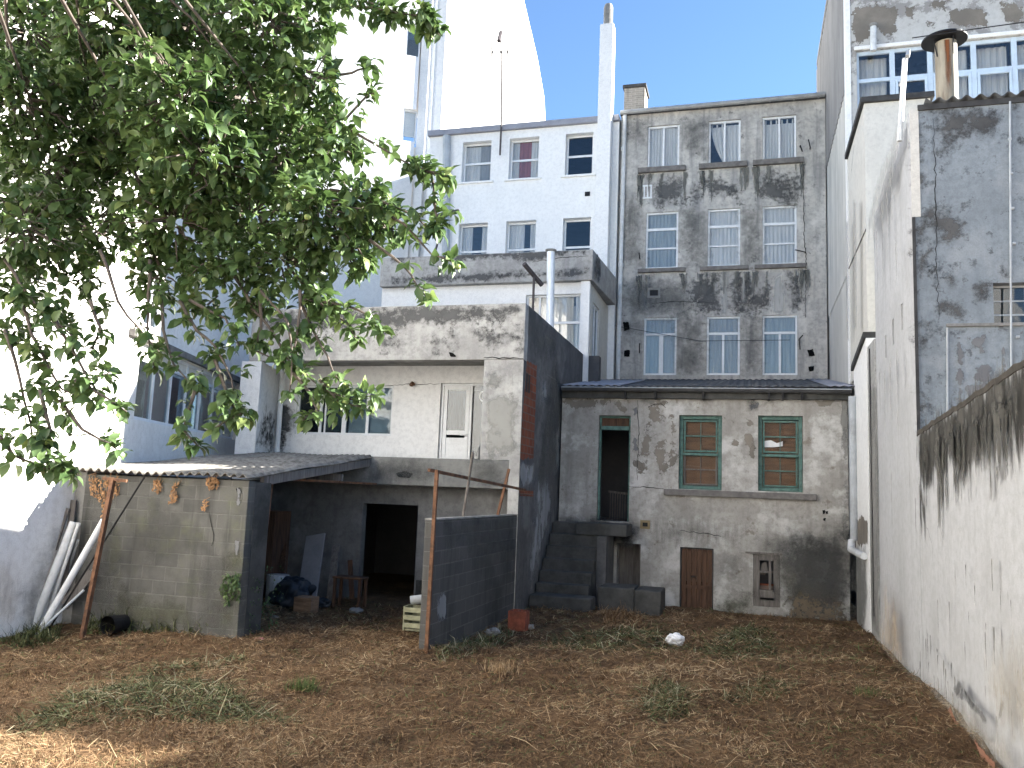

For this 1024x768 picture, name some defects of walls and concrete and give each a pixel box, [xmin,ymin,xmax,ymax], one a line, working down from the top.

peeling [851,1,915,44]
peeling [926,0,988,28]
peeling [1000,1,1024,23]
water stain [630,163,804,246]
crack [932,124,940,315]
water stain [263,305,524,355]
water stain [630,269,810,366]
peeling [486,361,537,460]
peeling [562,398,678,476]
peeling [731,400,759,459]
water stain [909,357,1024,528]
water stain [781,533,866,628]